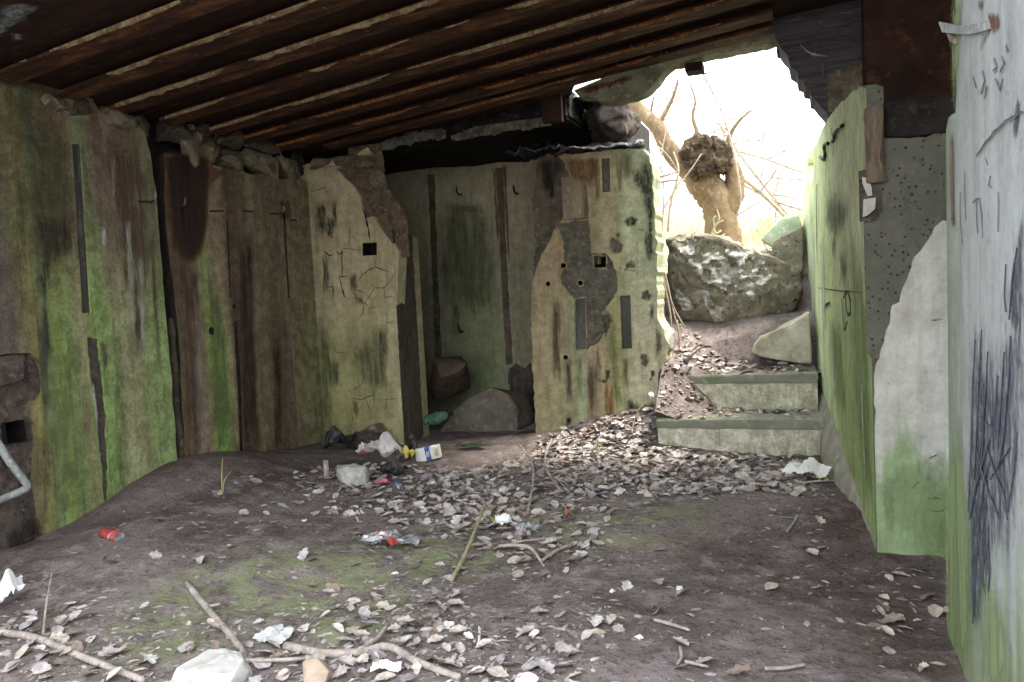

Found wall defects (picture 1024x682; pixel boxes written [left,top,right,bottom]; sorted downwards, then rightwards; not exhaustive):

spalling [0,353,40,551]
water stain [38,306,49,417]
water stain [39,144,71,292]
water stain [113,151,159,341]
water stain [167,155,209,435]
crack [344,209,394,323]
spalling [340,117,551,445]
spalling [532,152,654,360]
spalling [858,159,944,360]